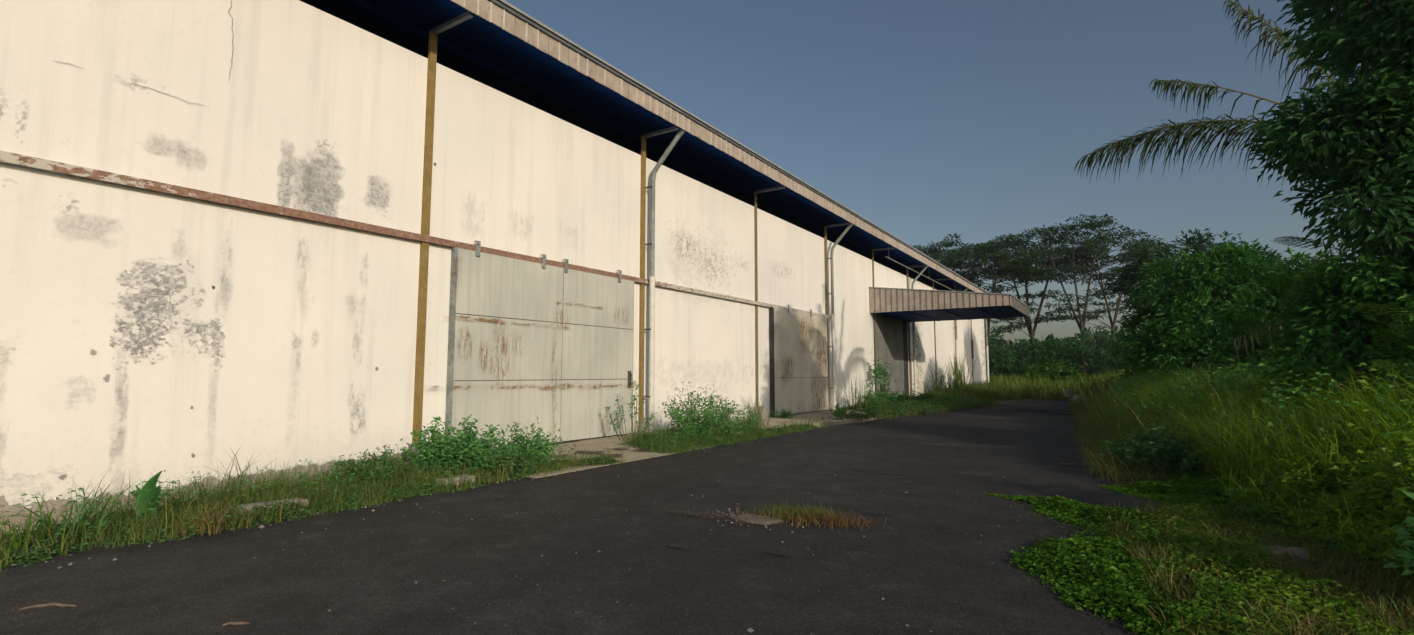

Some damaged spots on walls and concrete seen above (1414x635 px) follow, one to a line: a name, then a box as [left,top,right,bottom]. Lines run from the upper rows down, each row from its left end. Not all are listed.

corrosion [456,316,505,369]